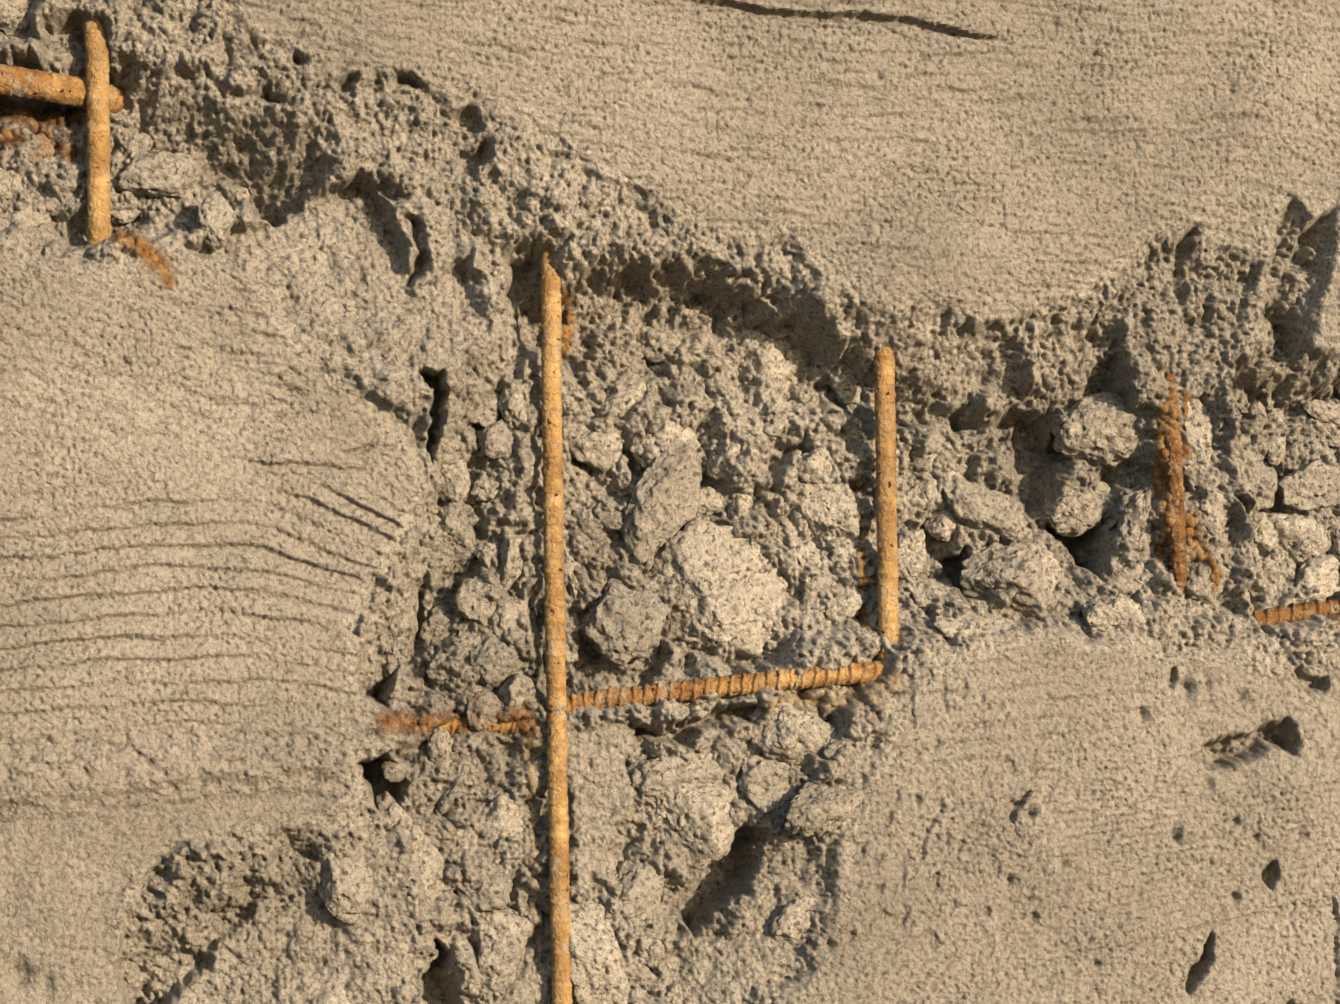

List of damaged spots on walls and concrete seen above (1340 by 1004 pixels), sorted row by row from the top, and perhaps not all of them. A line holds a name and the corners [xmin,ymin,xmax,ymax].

crack [656,0,1014,55]
rust [0,99,82,161]
spalling [0,0,359,286]
rust [561,287,576,356]
spalling [1230,190,1340,398]
rust [1148,387,1224,591]
spalling [1205,333,1340,706]
spalling [540,248,573,1004]
rust [761,672,909,715]
spalling [109,813,341,1004]
rust [377,701,546,975]
crack [1001,894,1340,1004]